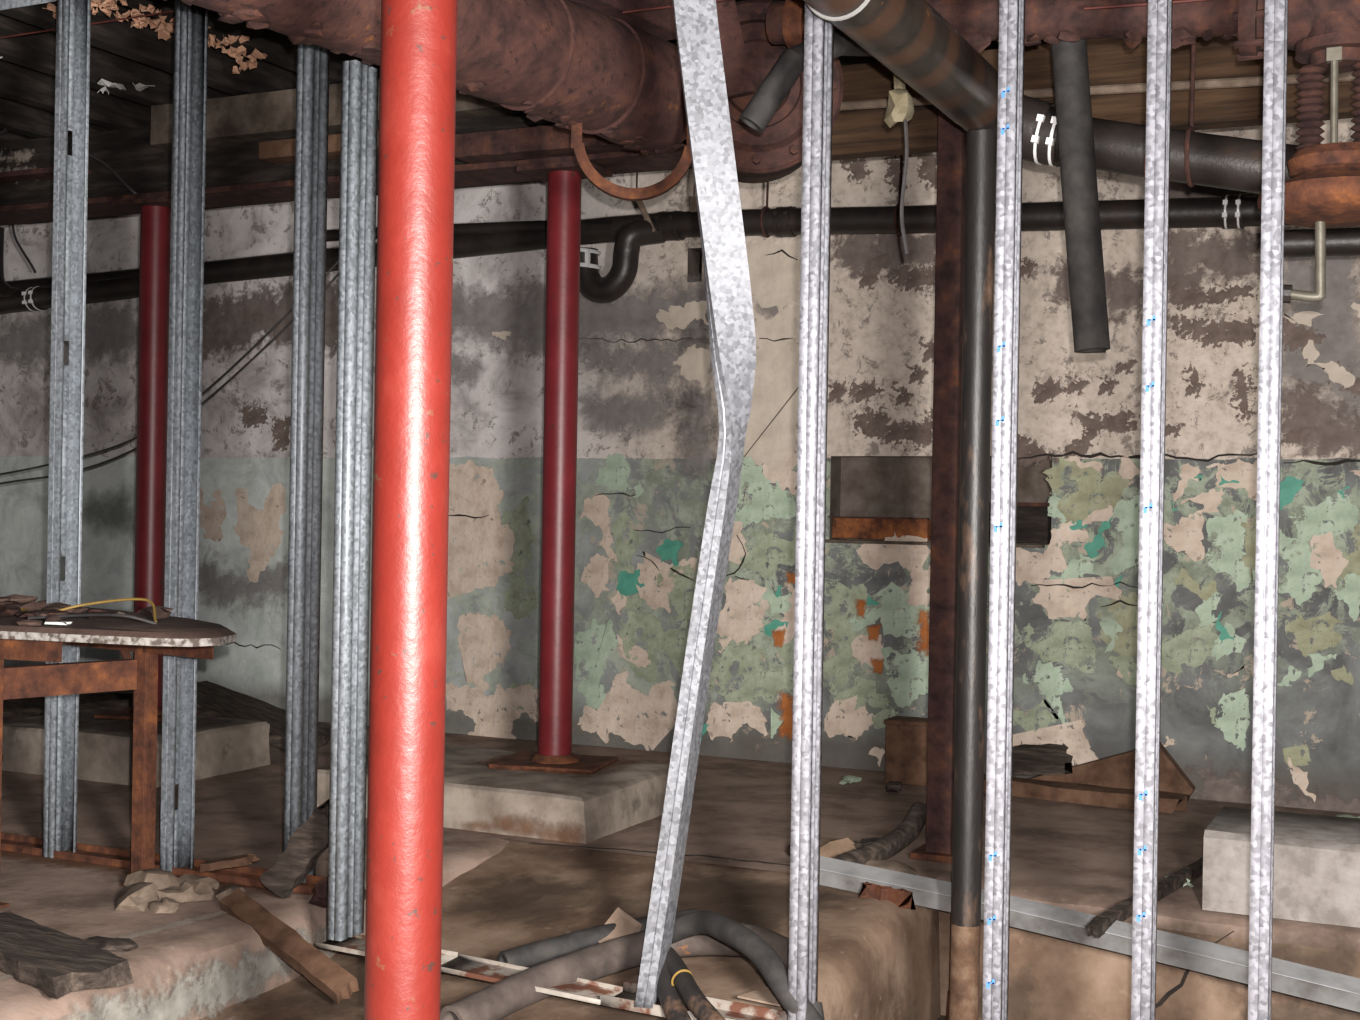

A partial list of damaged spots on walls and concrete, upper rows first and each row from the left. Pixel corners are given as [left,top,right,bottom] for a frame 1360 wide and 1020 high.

water stain [85,305,138,362]
water stain [202,282,293,363]
water stain [325,275,338,358]
water stain [1104,264,1144,328]
water stain [1168,228,1261,304]
water stain [1281,256,1360,458]
peeling [446,460,540,739]
peeling [574,453,698,751]
peeling [701,239,800,742]
peeling [823,532,931,740]
peeling [1013,357,1141,766]
peeling [1161,459,1257,751]